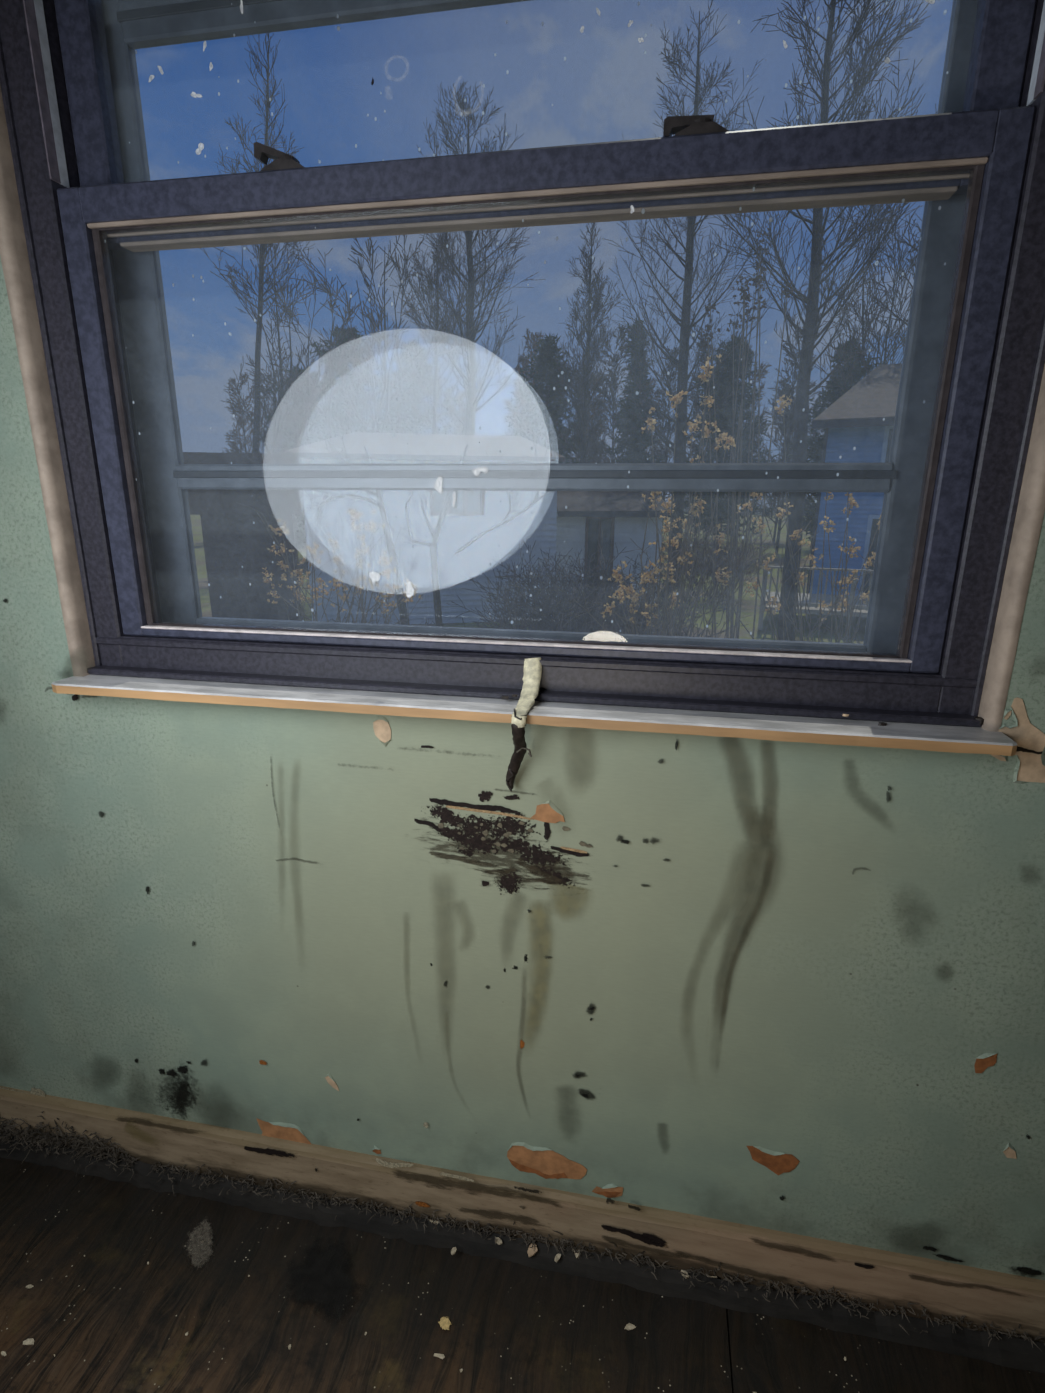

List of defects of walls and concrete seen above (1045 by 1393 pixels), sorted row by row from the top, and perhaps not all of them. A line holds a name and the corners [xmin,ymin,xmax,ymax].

peeling [992,697,1045,784]
peeling [974,1053,997,1073]
leakage [116,1060,207,1134]
leakage [244,1146,297,1158]
peeling [507,1142,623,1198]
peeling [747,1146,800,1175]
leakage [394,1171,558,1225]
leakage [601,1225,787,1281]
leakage [751,1238,832,1261]
leakage [923,1246,963,1262]
leakage [909,1275,1020,1296]
leakage [1012,1267,1044,1277]